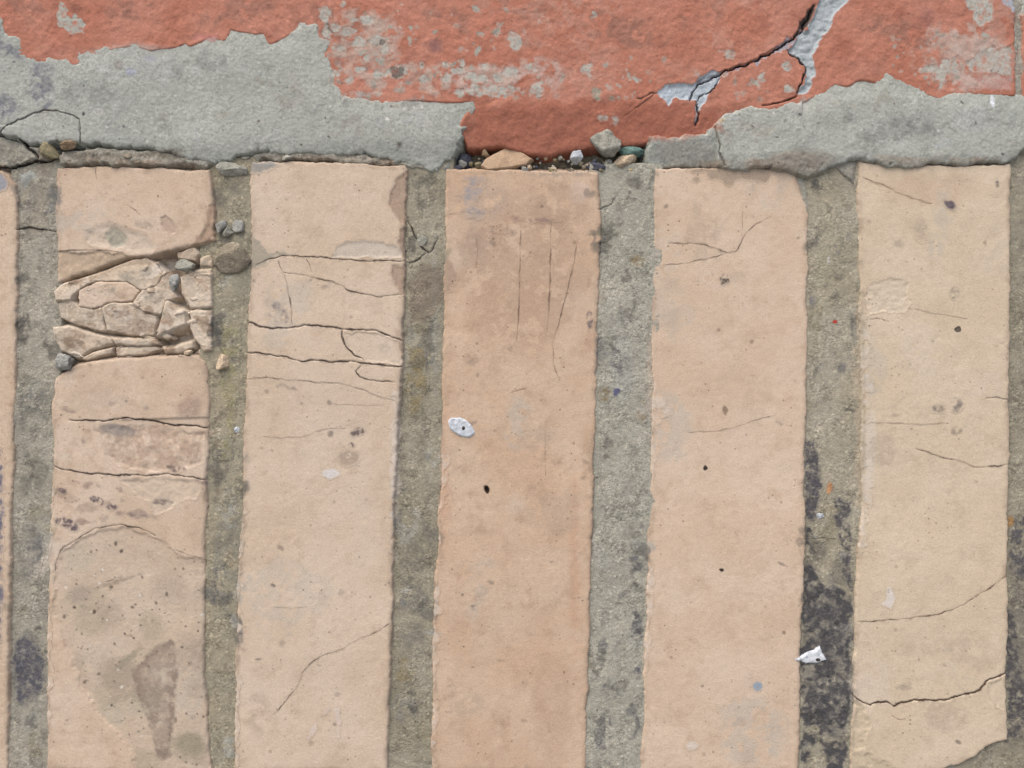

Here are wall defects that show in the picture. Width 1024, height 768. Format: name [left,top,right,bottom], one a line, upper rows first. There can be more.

peeling [55,0,86,35]
peeling [963,0,1023,30]
peeling [317,0,555,100]
peeling [579,62,621,127]
crack [689,11,811,166]
peeling [780,57,796,94]
peeling [916,45,1013,91]
crack [0,109,81,171]
crack [248,221,439,438]
crack [70,417,208,429]
crack [55,466,206,480]
crack [852,673,1005,720]